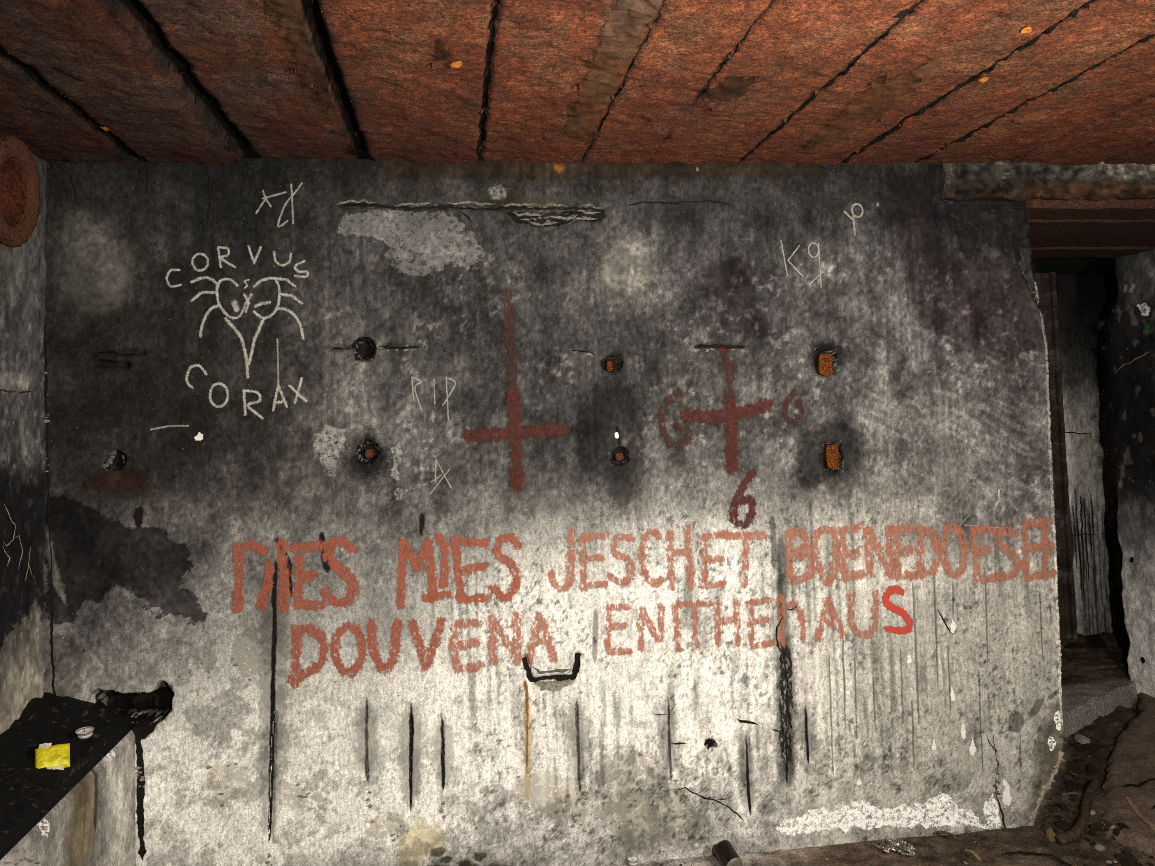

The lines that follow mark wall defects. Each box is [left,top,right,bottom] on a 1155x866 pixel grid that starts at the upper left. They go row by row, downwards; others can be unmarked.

flaking render [337,209,486,277]
crack [336,199,601,222]
water stain [133,506,144,527]
water stain [770,517,815,785]
water stain [776,792,1001,836]
crack [987,735,1072,866]